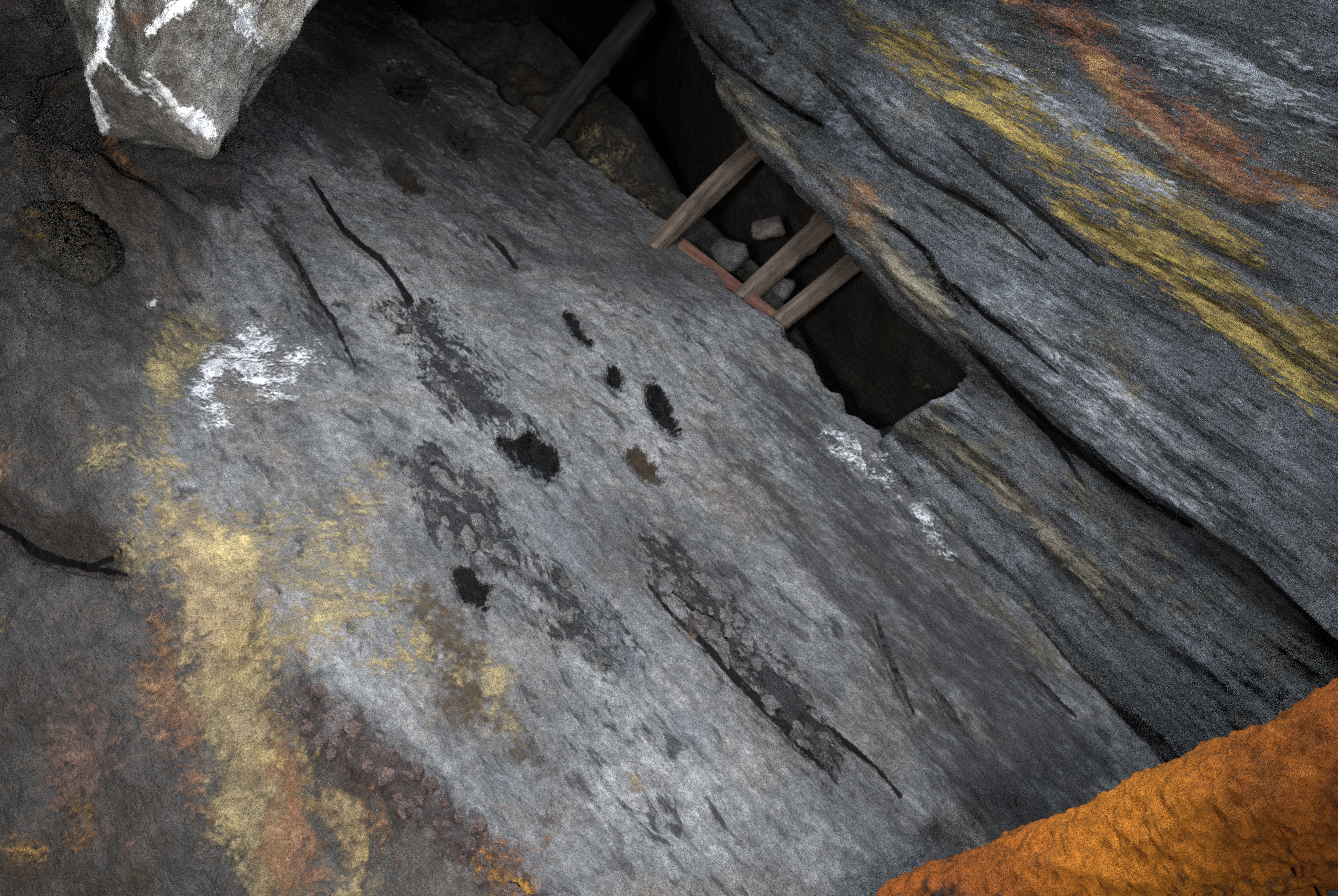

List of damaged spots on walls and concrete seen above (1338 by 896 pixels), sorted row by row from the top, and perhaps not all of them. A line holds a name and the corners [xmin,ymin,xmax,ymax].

corrosion [1001,0,1338,211]
crack [284,241,356,367]
crack [309,176,414,304]
crack [487,234,518,270]
crack [0,523,136,577]
corrosion [389,581,502,731]
crack [647,582,902,798]
corrosion [254,710,332,896]
corrosion [344,785,397,850]
corrosion [472,805,550,896]
corrosion [876,678,1338,896]